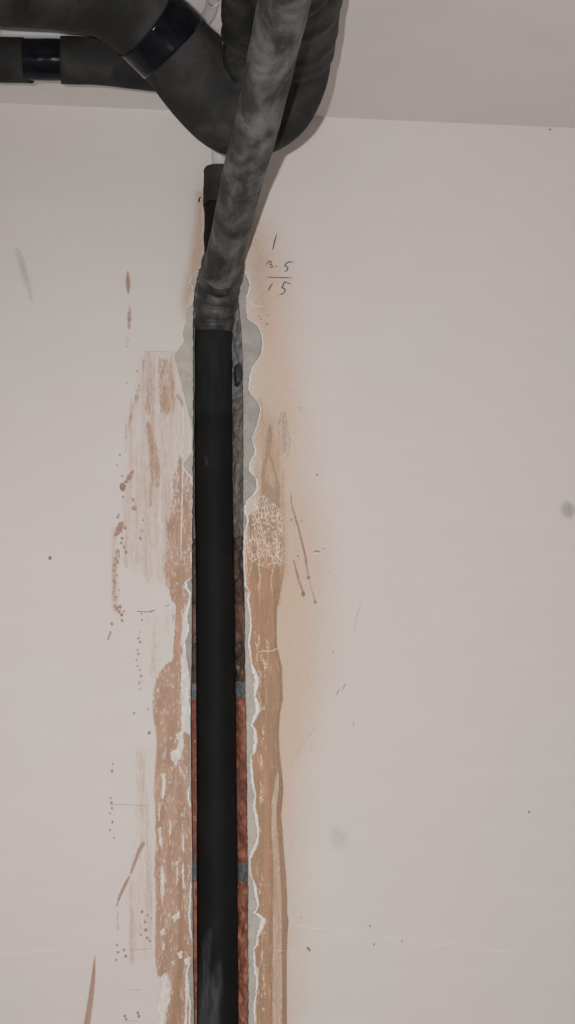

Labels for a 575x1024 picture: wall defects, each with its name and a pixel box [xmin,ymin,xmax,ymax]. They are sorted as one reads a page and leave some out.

flaking render [173,270,199,488]
rust [107,514,128,641]
rust [120,470,137,510]
peeling [238,271,266,1024]
water stain [244,199,352,1024]
rust [116,841,145,930]